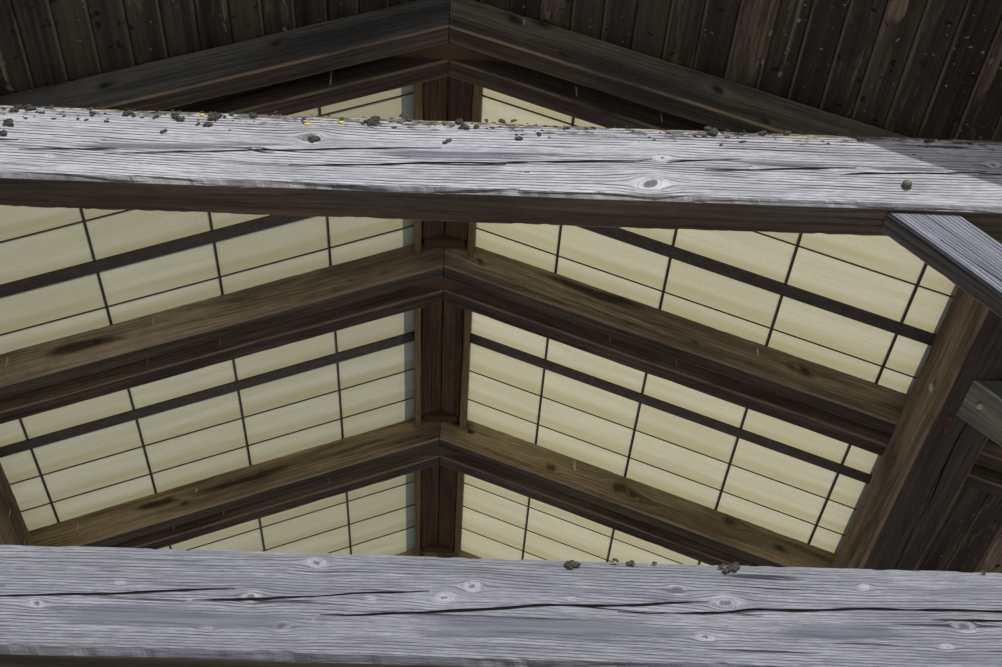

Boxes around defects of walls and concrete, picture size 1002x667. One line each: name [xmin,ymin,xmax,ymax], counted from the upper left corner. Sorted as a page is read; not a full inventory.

crack [0,139,1002,175]
crack [0,588,1002,621]